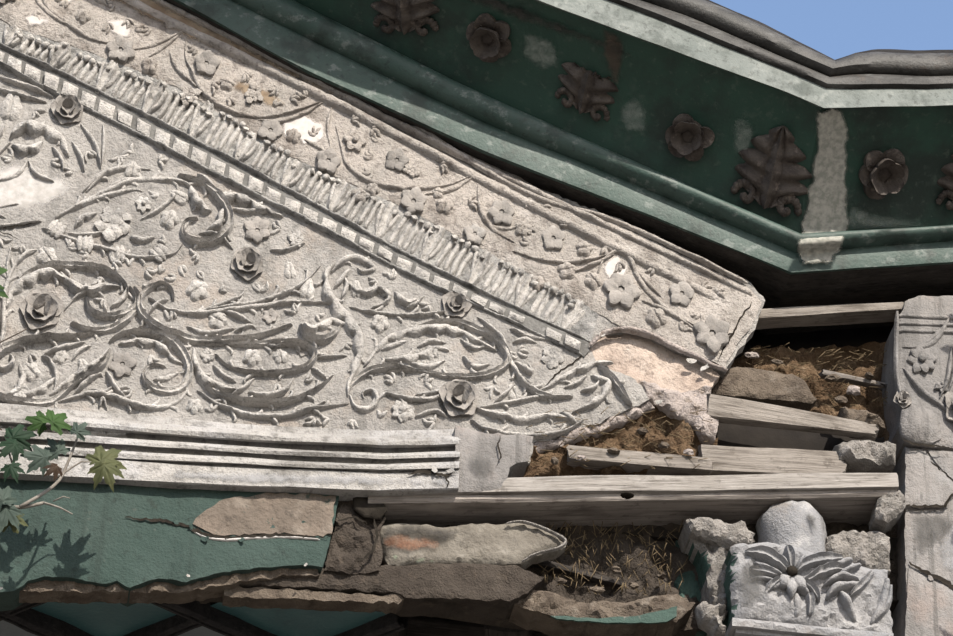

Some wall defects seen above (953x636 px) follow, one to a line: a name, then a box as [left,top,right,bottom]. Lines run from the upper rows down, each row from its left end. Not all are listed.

peeling [798,108,880,262]
spalling [533,326,728,453]
crack [906,462,953,508]
spalling [684,538,729,608]
crack [909,562,953,589]